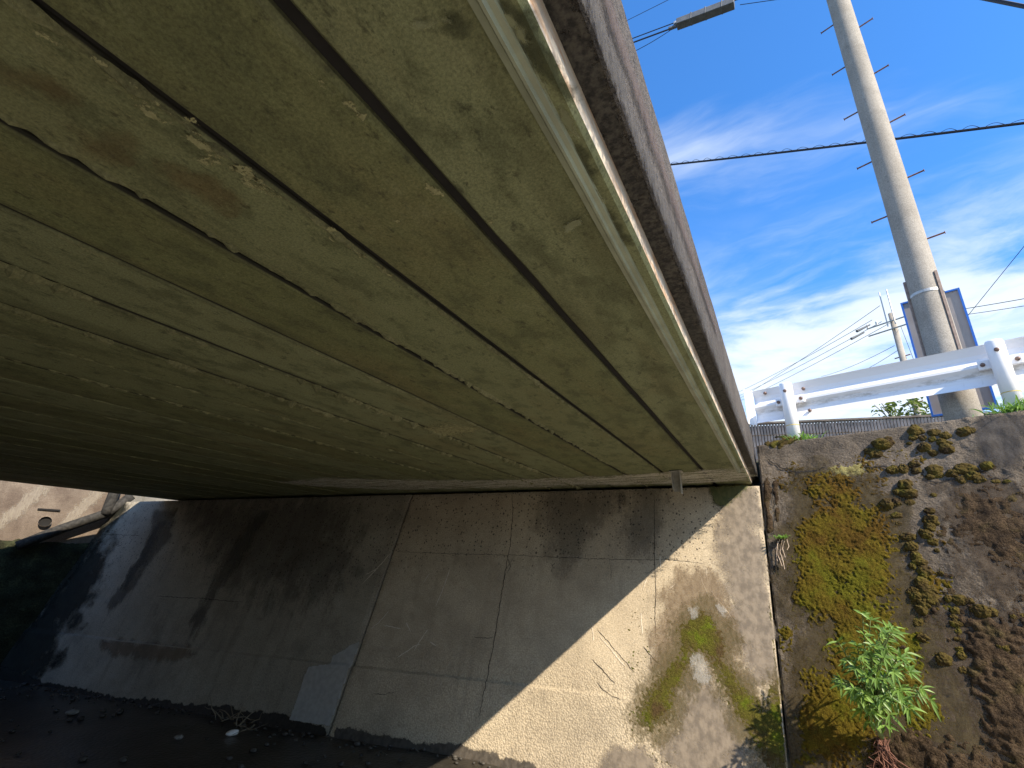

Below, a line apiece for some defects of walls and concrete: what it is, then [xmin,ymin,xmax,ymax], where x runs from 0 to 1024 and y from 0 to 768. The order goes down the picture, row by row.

peeling [91,56,282,198]
leakage [109,510,177,608]
leakage [273,468,778,686]
crack [399,500,702,715]